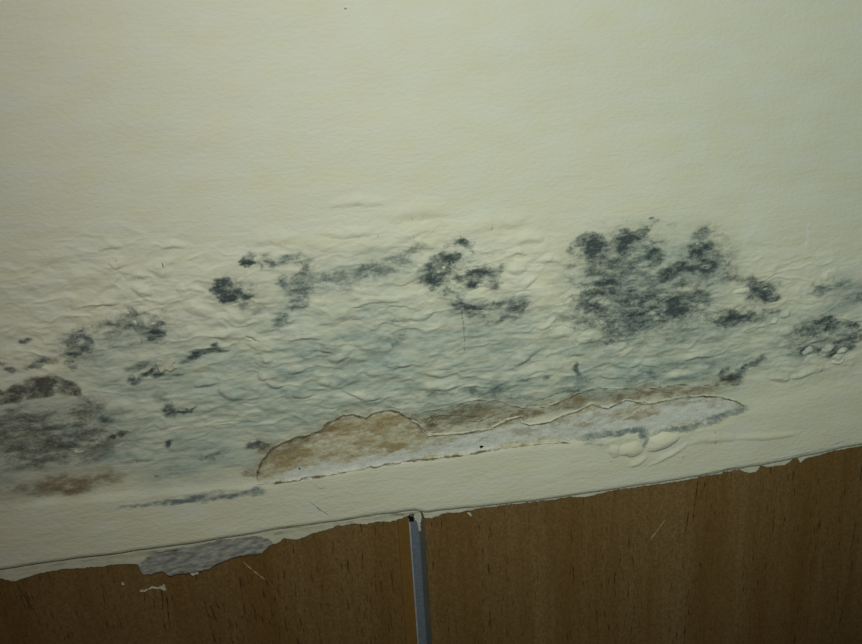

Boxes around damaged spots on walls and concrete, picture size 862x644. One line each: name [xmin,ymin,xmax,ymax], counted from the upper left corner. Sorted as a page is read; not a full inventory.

water stain [209,277,253,309]
water stain [239,255,313,326]
water stain [420,238,529,323]
water stain [568,217,722,344]
water stain [713,276,780,328]
water stain [0,358,80,404]
water stain [64,330,94,367]
water stain [106,311,166,341]
water stain [177,343,227,376]
water stain [795,315,862,358]
flaking render [256,394,746,484]
water stain [162,487,261,505]